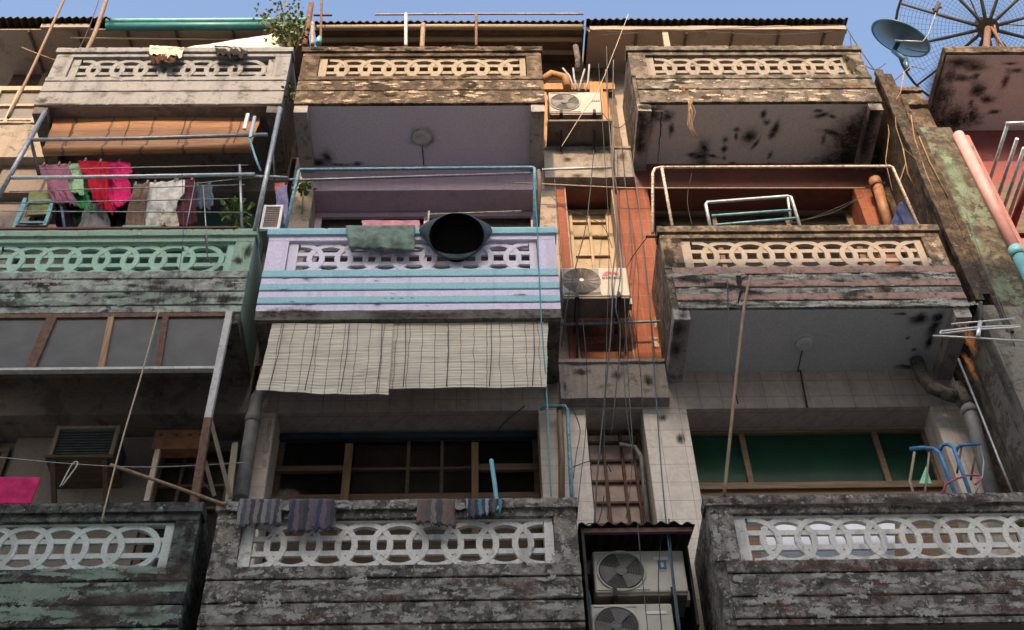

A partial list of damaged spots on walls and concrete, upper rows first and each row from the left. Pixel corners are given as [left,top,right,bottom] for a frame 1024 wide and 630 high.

peeling [300,81,544,103]
peeling [644,78,874,101]
damp [928,60,998,127]
damp [637,108,673,151]
damp [690,128,758,164]
damp [823,107,885,163]
peeling [665,272,983,307]
damp [895,313,942,369]
peeling [203,503,578,630]
peeling [0,564,166,626]
peeling [104,590,182,627]
peeling [736,569,1024,621]